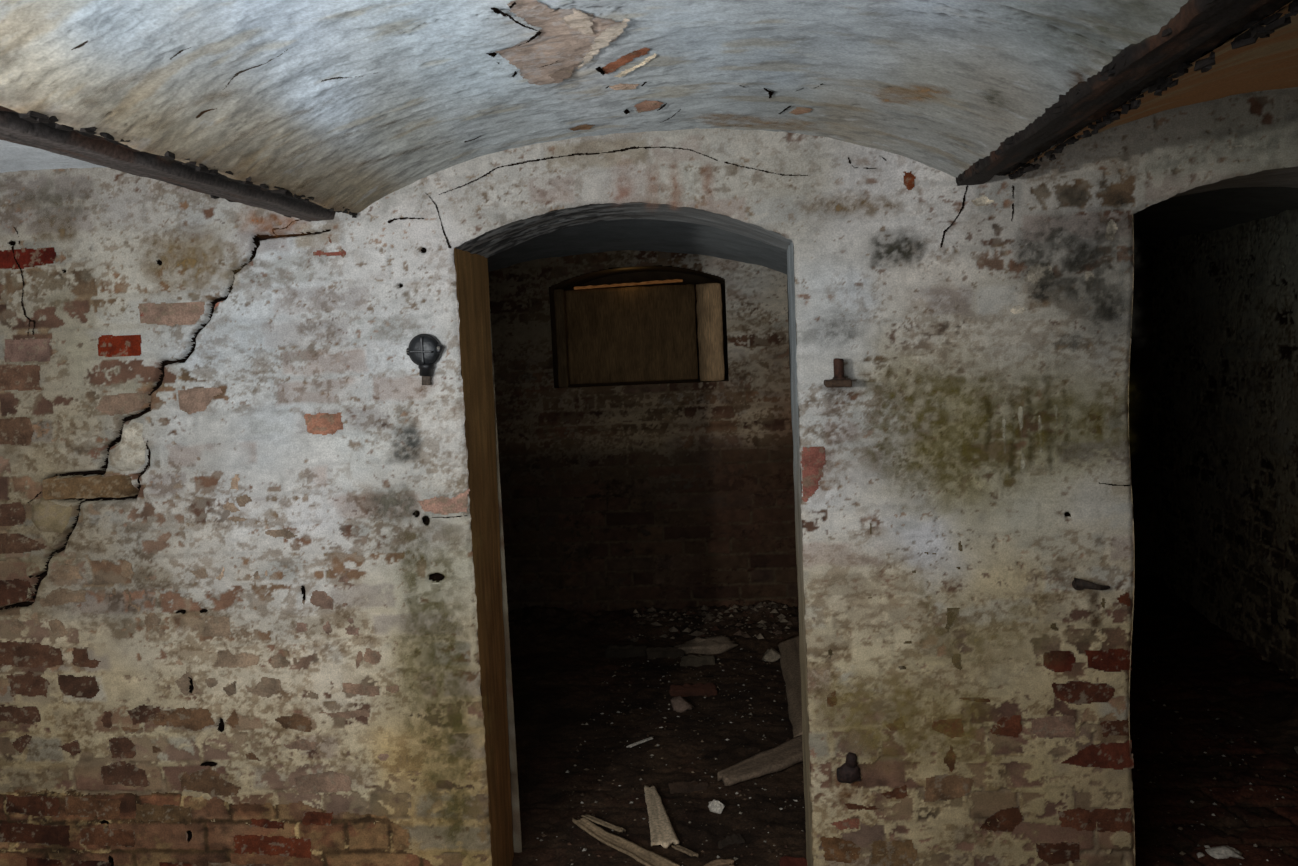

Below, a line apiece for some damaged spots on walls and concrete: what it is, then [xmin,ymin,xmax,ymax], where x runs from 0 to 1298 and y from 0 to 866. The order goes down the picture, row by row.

spalling [486,0,667,114]
flaking render [0,247,56,270]
crack [388,109,808,248]
crack [940,185,968,248]
flaking render [97,301,223,357]
crack [0,219,331,610]
flaking render [304,412,343,435]
leakage [870,377,1073,482]
peeling [0,558,101,754]
peeling [0,616,432,866]
peeling [275,590,399,751]
flaking render [988,647,1134,770]